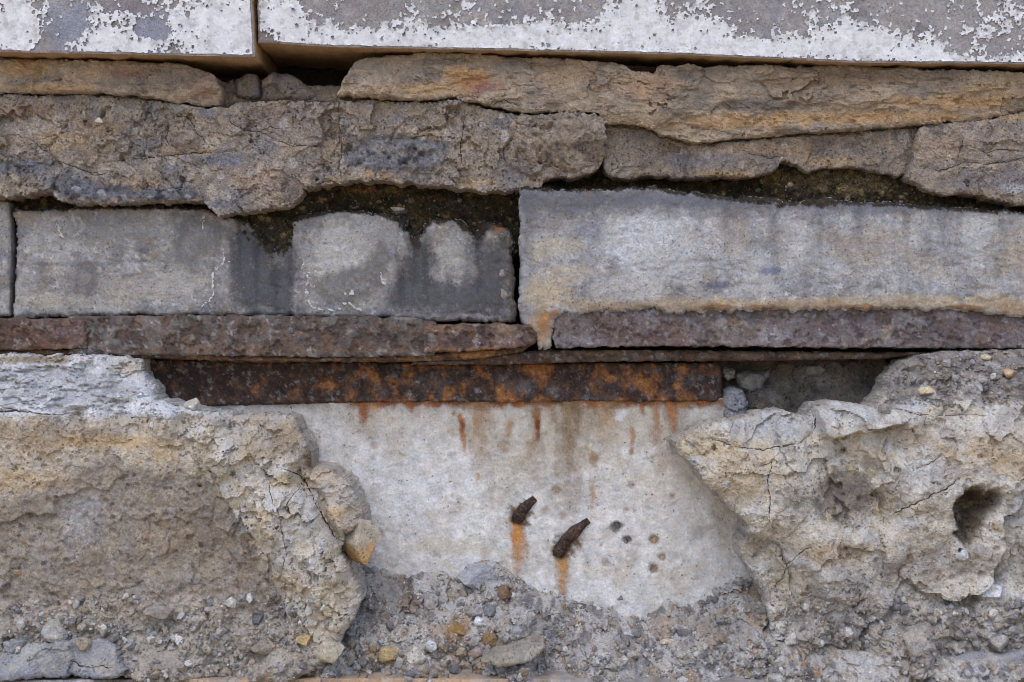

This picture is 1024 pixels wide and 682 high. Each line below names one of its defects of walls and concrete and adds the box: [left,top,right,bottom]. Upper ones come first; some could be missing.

peeling [0,0,1024,62]
damp [175,217,508,316]
rust [108,345,530,363]
rust [359,399,724,452]
crack [269,469,337,569]
rust [511,522,527,561]
rust [552,549,569,593]
crack [717,418,816,518]
spalling [666,349,1024,682]
crack [890,479,957,516]